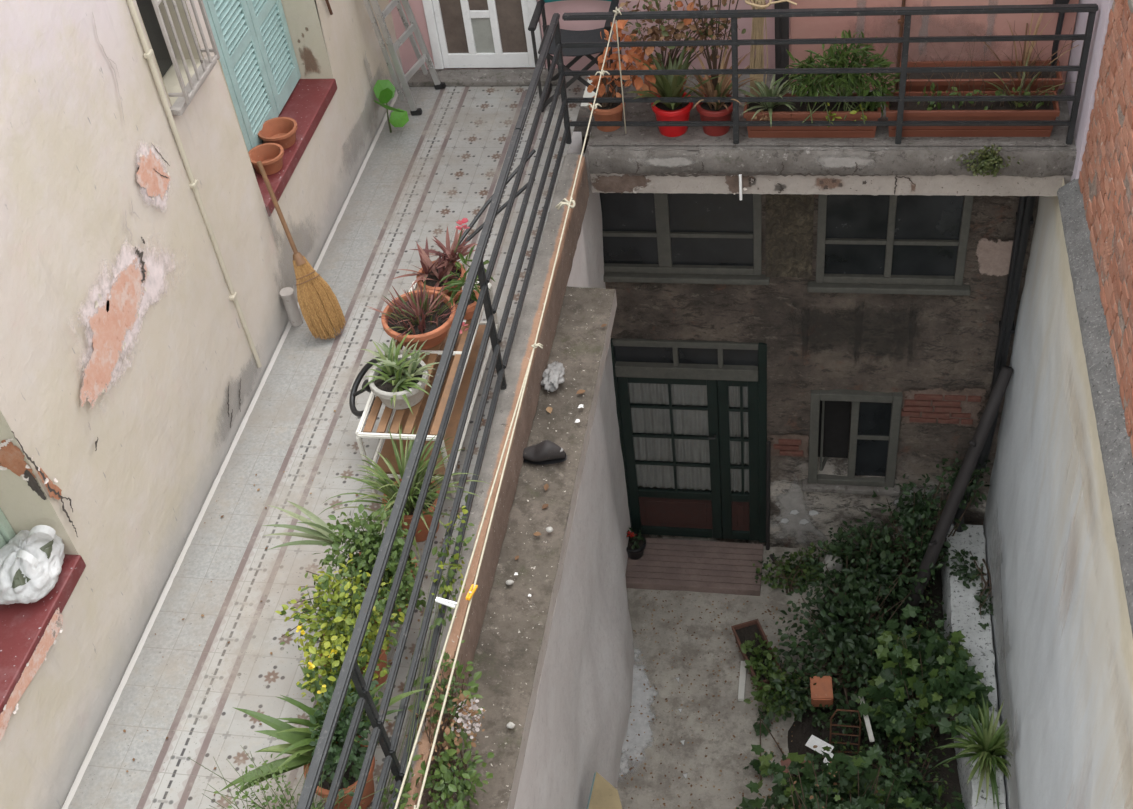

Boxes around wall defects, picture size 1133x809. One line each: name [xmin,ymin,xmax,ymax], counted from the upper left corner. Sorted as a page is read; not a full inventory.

flaking render [79,144,175,451]
spalling [0,438,46,500]
crack [11,431,78,537]